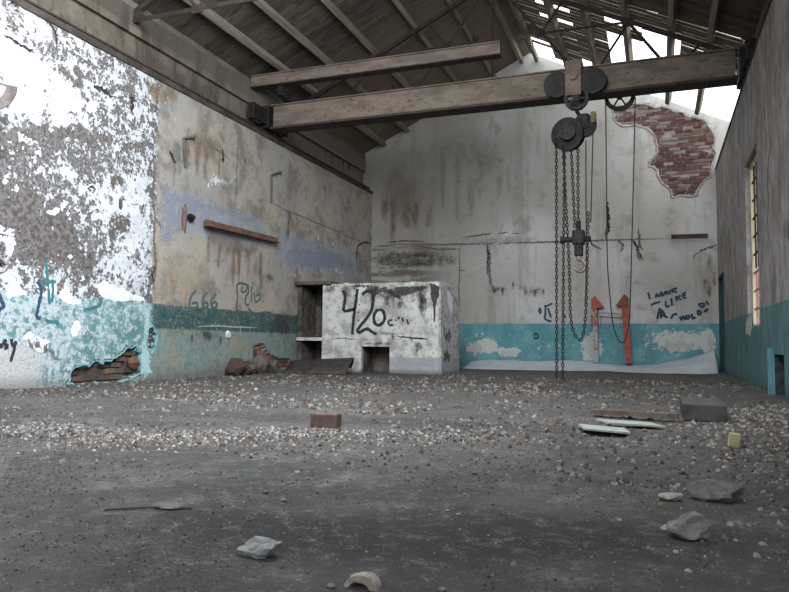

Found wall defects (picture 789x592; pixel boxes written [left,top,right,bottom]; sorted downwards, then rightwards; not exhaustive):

peeling [50,59,89,89]
spalling [611,102,717,199]
peeling [0,116,158,386]